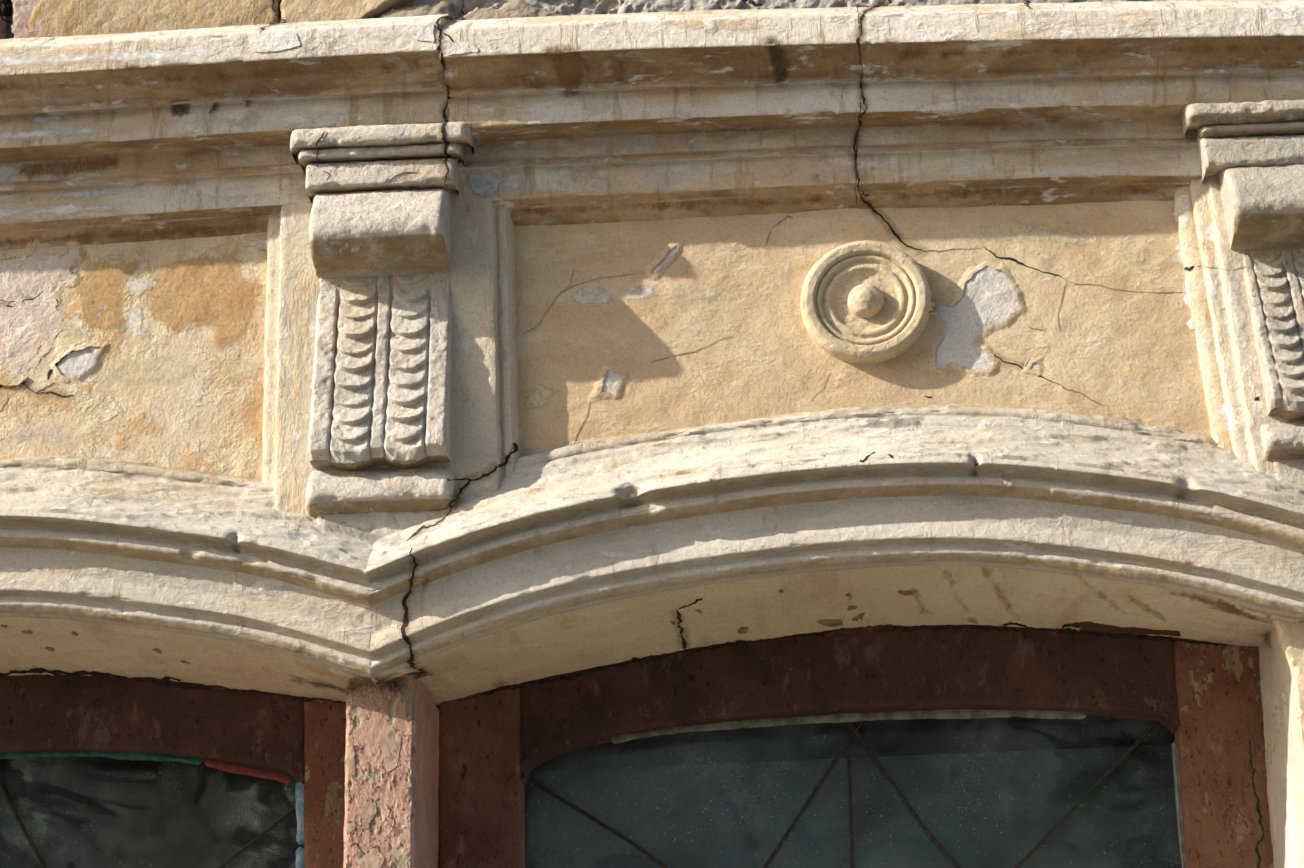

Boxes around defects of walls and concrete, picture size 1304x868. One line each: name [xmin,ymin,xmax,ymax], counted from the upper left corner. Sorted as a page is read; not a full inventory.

flaking render [0,0,565,55]
flaking render [616,0,885,14]
crack [853,0,1252,405]
flaking render [928,260,1027,377]
crack [0,345,81,411]
flaking render [585,364,630,404]
crack [401,443,519,679]
crack [458,598,1235,701]
peeling [346,745,356,776]
peeling [379,725,401,773]
peeling [345,799,385,868]